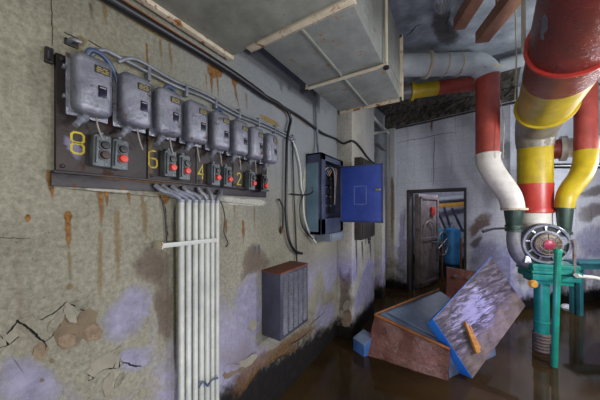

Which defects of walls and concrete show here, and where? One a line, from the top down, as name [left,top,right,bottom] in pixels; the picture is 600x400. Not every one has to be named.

damp [432,12,457,42]
rust [208,65,222,89]
rust [64,212,72,245]
damp [157,208,176,345]
crack [0,299,91,350]
flaking render [47,296,103,350]
spalling [222,354,257,379]